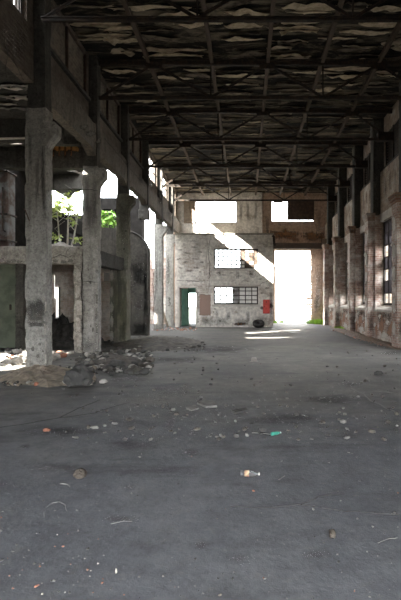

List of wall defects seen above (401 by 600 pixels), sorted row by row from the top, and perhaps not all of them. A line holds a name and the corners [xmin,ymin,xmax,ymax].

peeling [65,0,401,61]
peeling [0,84,28,111]
peeling [102,66,398,138]
flaking render [0,262,155,375]